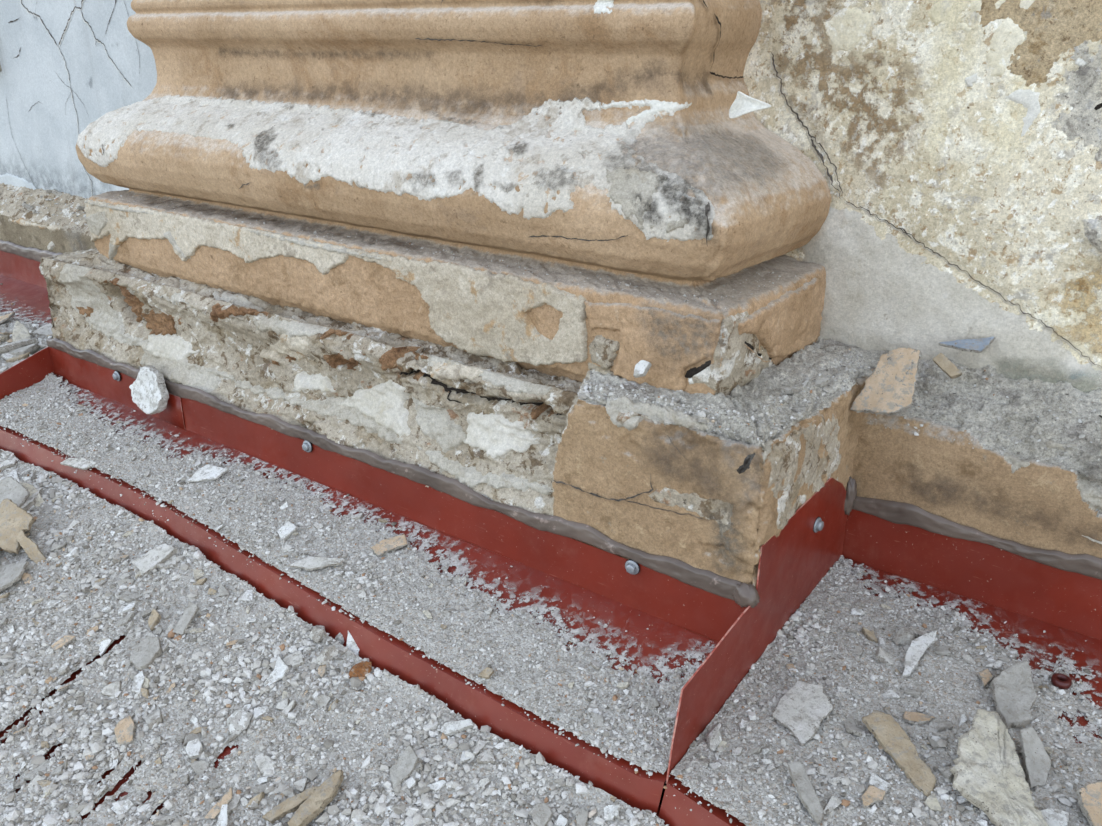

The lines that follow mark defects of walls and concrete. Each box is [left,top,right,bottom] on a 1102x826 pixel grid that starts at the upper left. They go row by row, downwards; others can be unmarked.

crack [6,0,140,194]
peeling [77,95,715,242]
peeling [593,0,614,14]
peeling [729,91,771,119]
peeling [823,0,873,51]
flaking render [928,0,1102,164]
spalling [8,199,822,516]
flaking render [132,543,178,575]
flaking render [277,521,298,541]
flaking render [648,487,733,536]
flaking render [761,395,841,529]
spalling [850,347,1102,518]